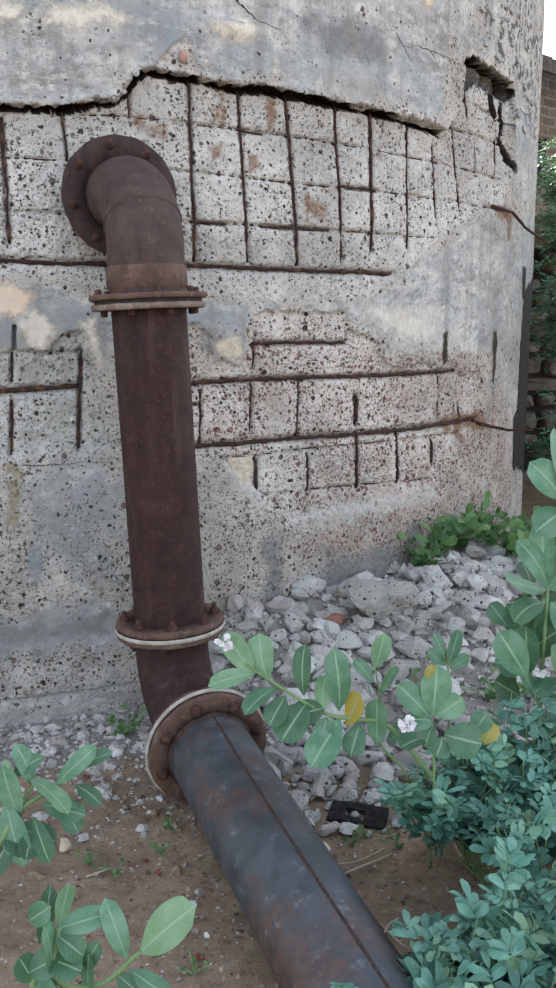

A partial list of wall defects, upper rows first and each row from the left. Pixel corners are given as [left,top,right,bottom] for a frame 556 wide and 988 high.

rust [266,98,276,126]
spalling [0,0,548,528]